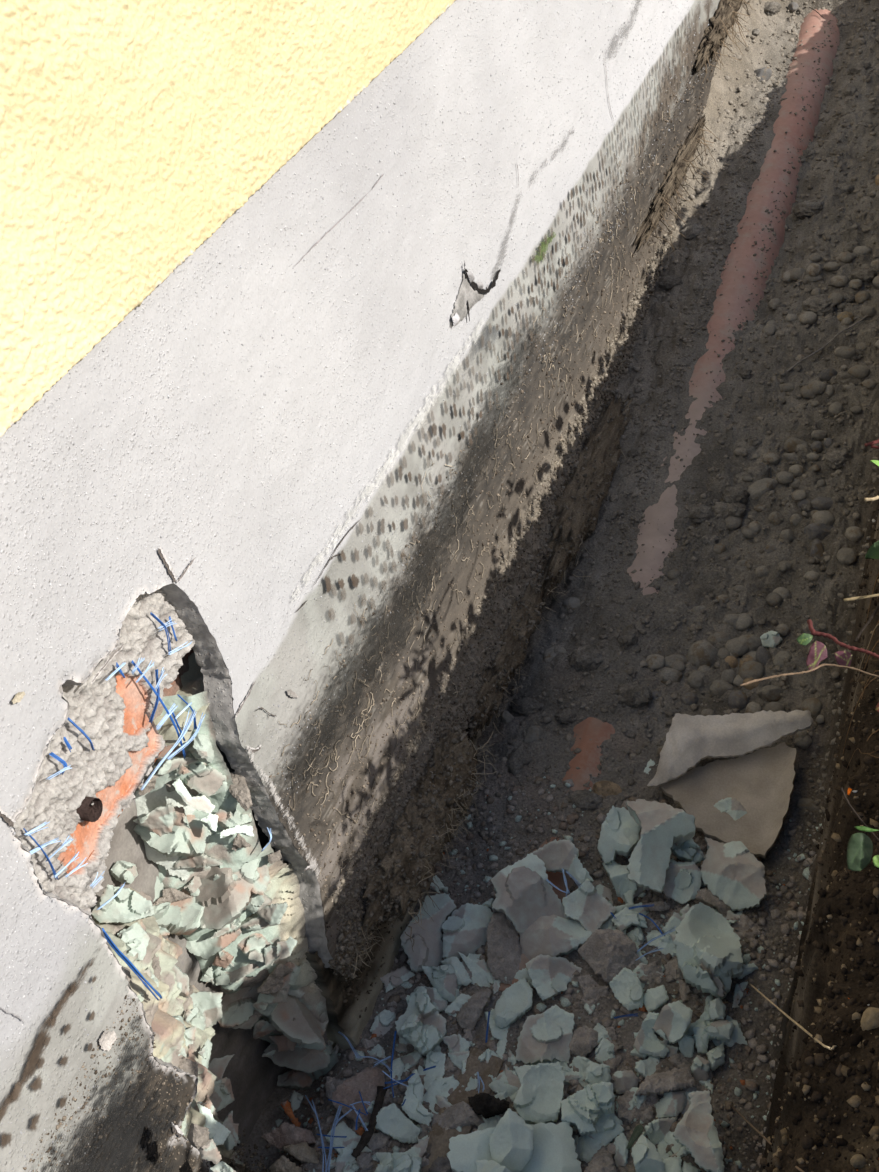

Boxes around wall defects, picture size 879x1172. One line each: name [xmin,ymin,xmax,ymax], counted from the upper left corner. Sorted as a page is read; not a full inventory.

peeling [450,261,501,327]
damp [325,13,697,644]
spalling [14,584,206,915]
damp [0,959,96,1149]
spalling [99,1030,117,1052]
damp [43,1017,184,1172]
peeling [289,1091,303,1112]